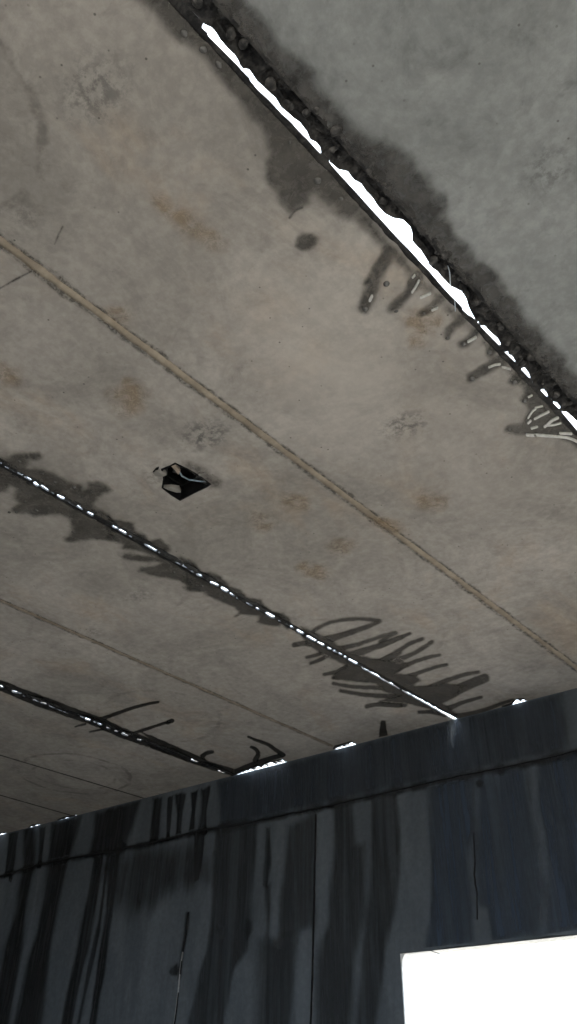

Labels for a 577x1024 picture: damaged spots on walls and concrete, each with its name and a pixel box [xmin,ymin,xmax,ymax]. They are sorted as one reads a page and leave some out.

water stain [147,0,577,401]
water stain [0,453,290,629]
hole [153,463,219,501]
water stain [468,345,577,443]
spalling [234,759,286,775]
water stain [0,617,577,1024]